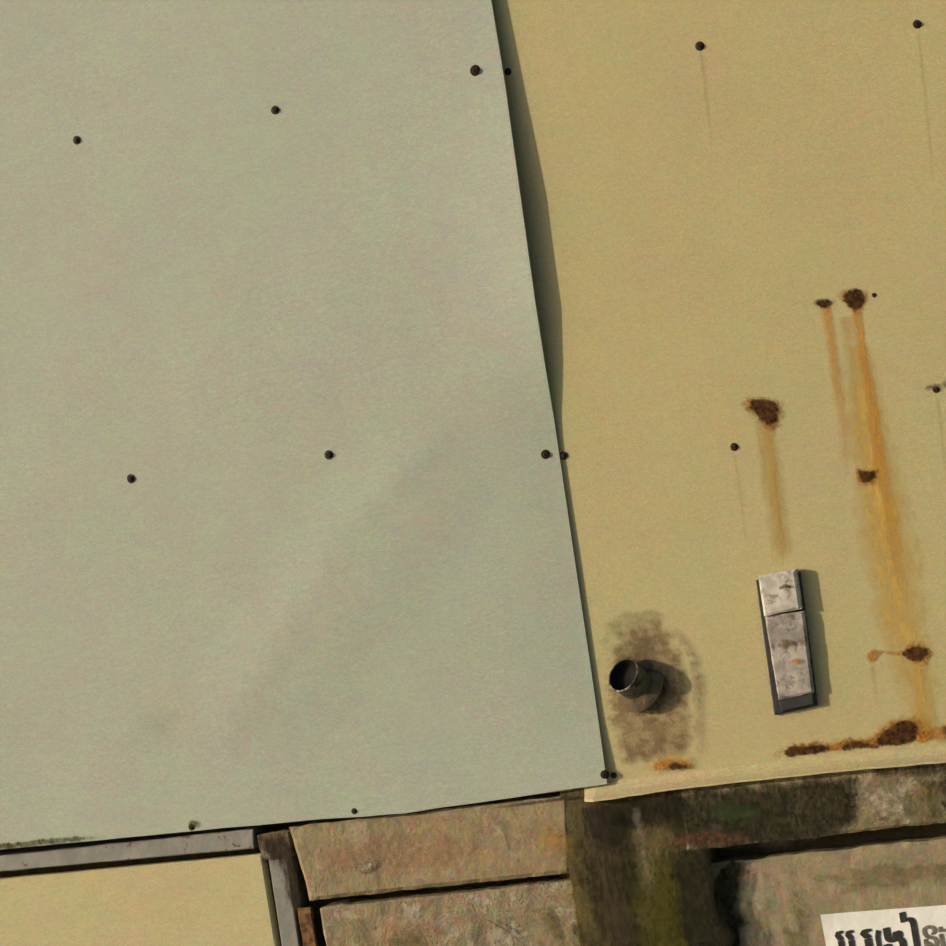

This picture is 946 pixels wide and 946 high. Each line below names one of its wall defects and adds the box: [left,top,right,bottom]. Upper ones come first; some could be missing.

rust [744,399,780,451]
rust [815,288,931,702]
rust [785,716,946,757]
rust [653,759,689,771]
damp [541,778,856,946]